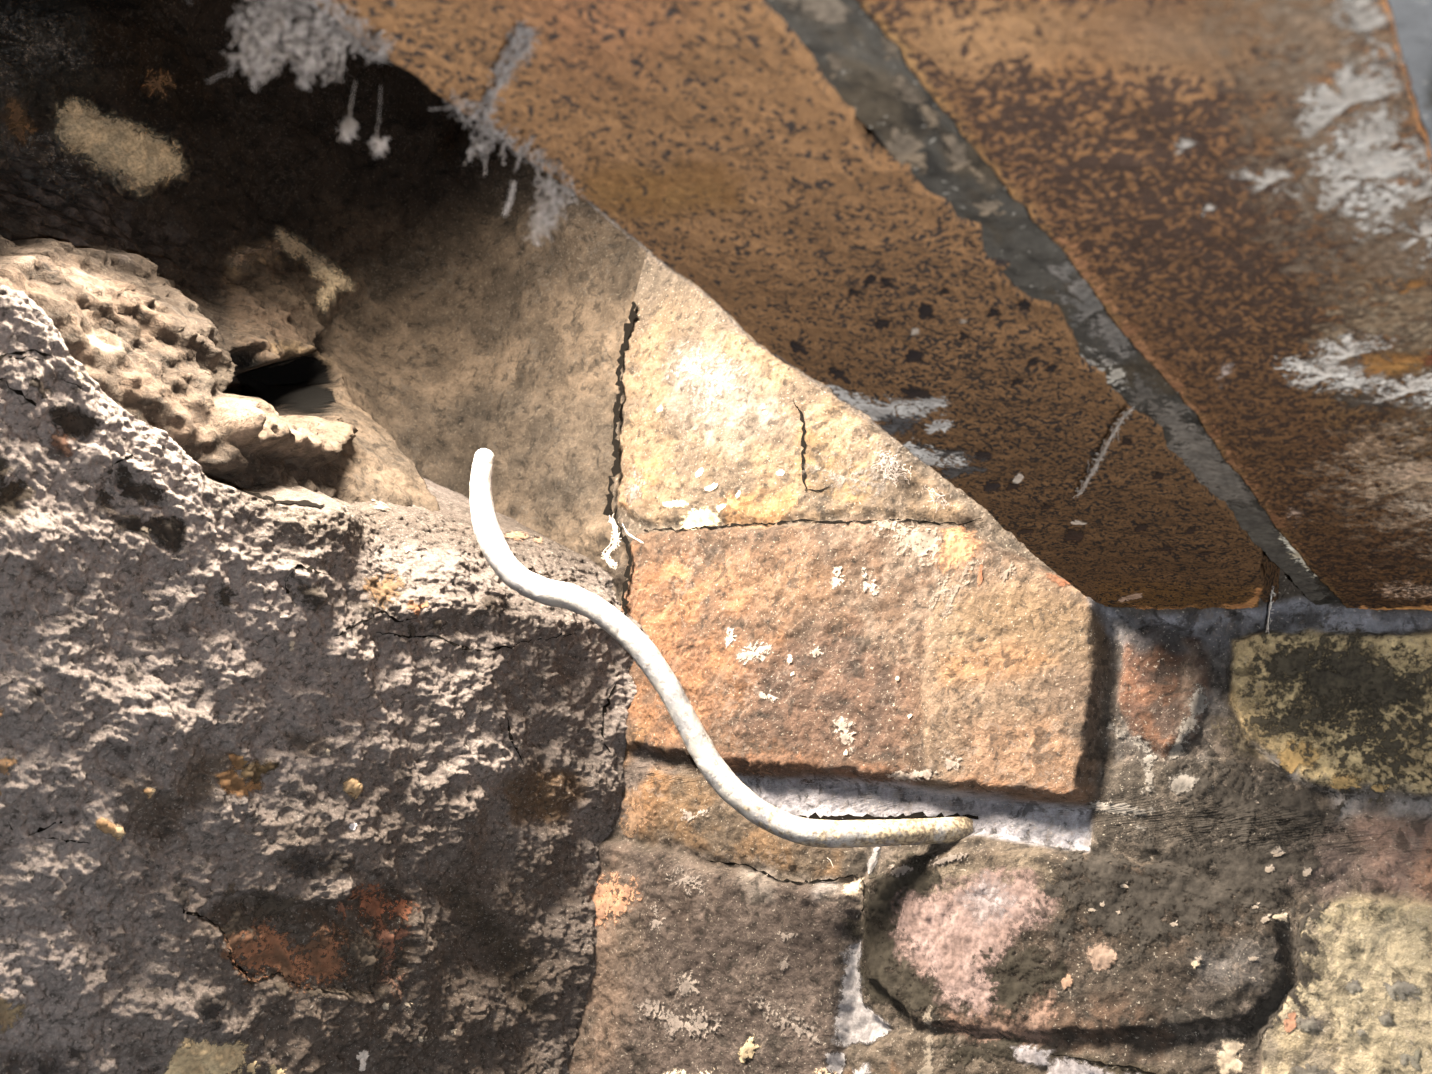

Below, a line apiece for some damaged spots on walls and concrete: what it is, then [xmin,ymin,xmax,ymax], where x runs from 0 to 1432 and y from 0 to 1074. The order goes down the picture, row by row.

water stain [0,6,86,107]
water stain [1175,139,1194,154]
water stain [1202,0,1432,546]
water stain [1079,346,1129,396]
crack [603,301,982,616]
water stain [826,385,988,479]
efflorescence [1381,582,1432,598]